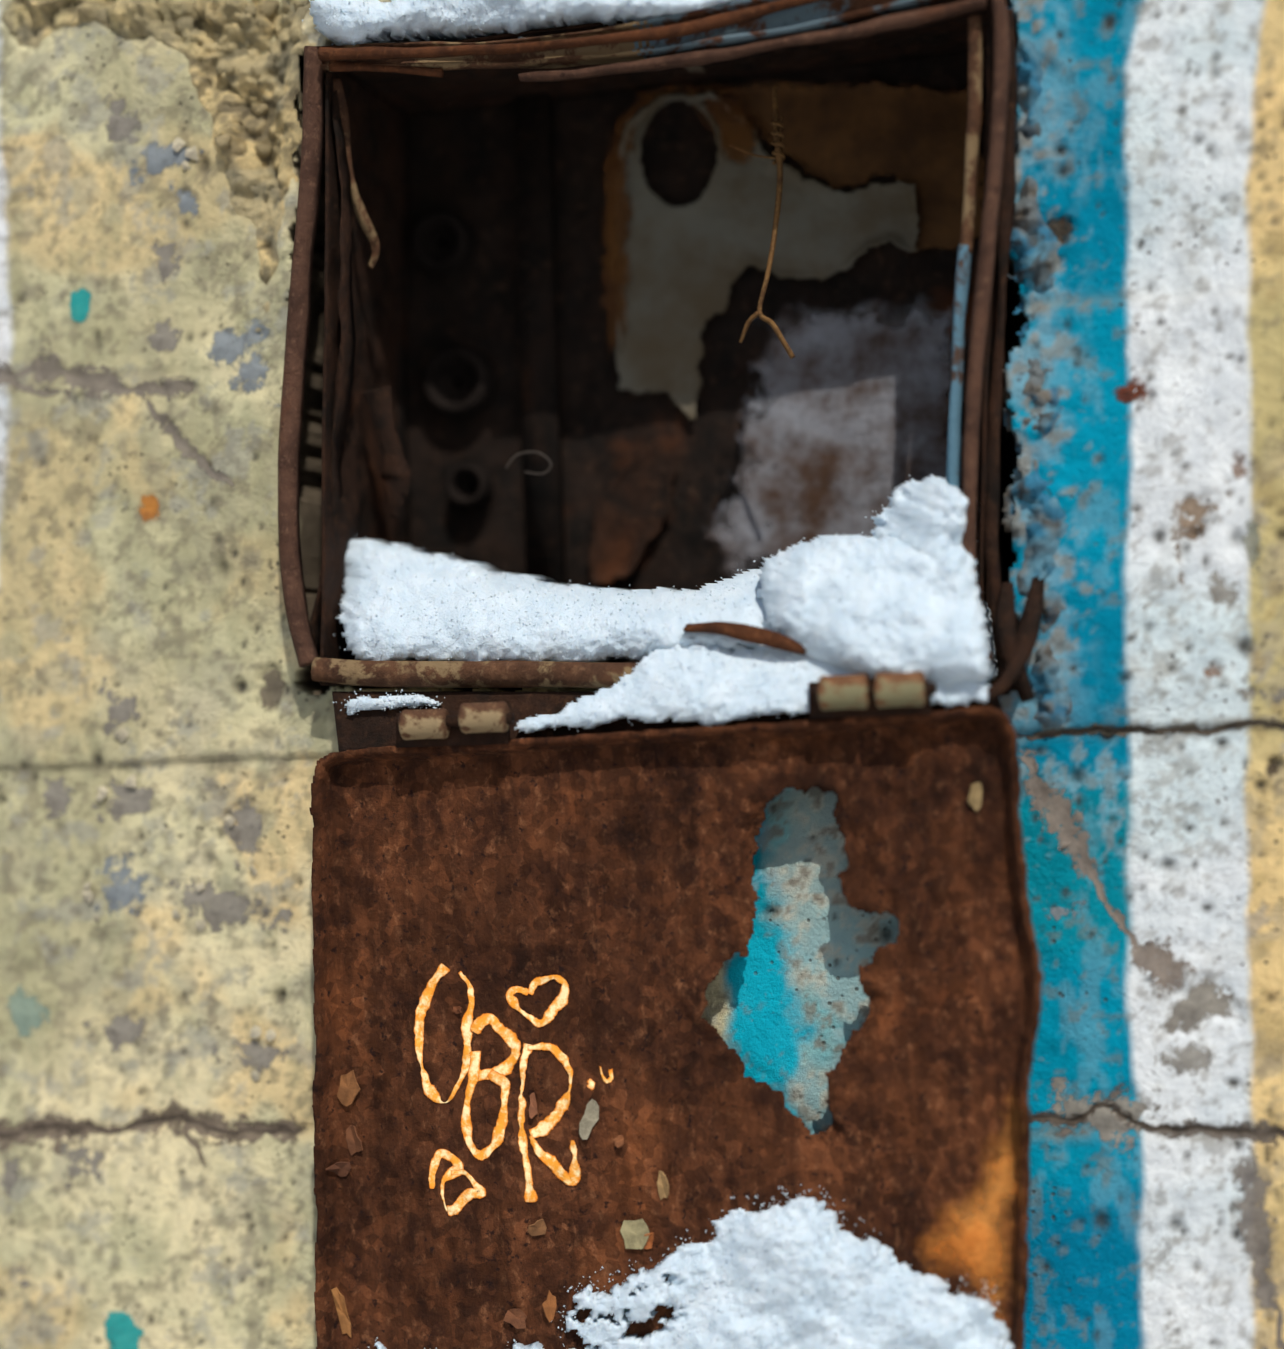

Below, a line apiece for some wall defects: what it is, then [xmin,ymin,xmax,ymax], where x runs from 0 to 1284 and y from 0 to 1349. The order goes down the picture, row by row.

spalling [1,0,316,285]
spalling [1007,5,1044,153]
crack [0,342,234,486]
peeling [147,317,183,352]
spalling [207,302,270,393]
spalling [998,175,1074,729]
crack [0,1099,308,1166]
crack [1030,1084,1284,1349]